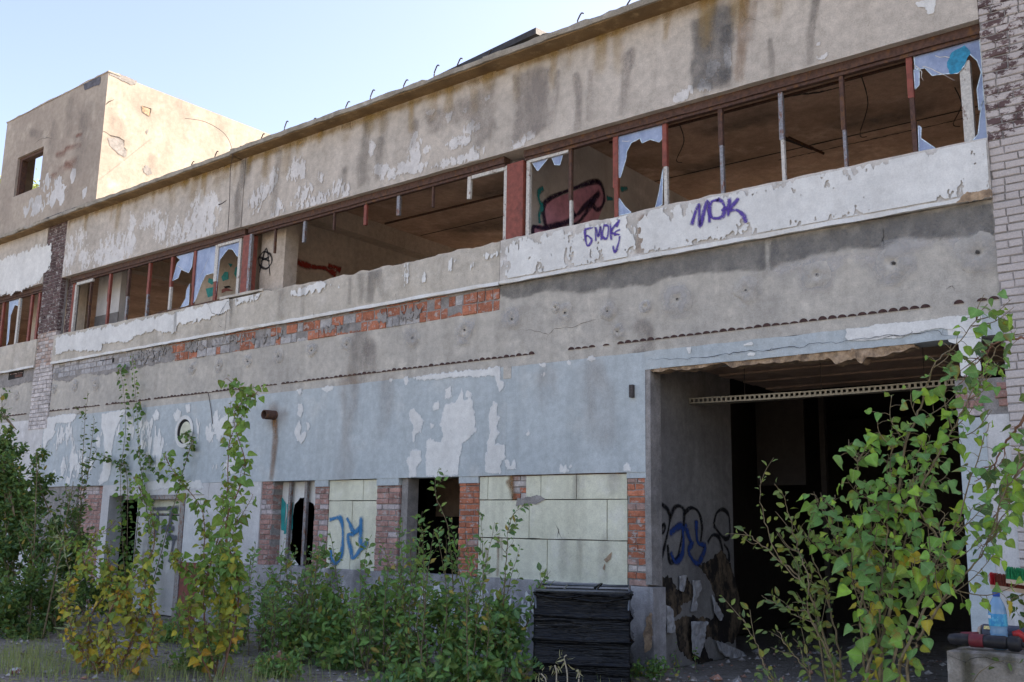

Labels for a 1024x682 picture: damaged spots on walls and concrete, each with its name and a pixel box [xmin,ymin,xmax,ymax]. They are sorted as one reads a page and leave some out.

damp [691,6,732,87]
peeling [23,168,87,218]
peeling [0,186,222,296]
peeling [53,138,993,382]
peeling [43,409,204,492]
peeling [173,404,236,443]
peeling [212,458,238,477]
peeling [389,366,526,499]
peeling [662,575,693,617]